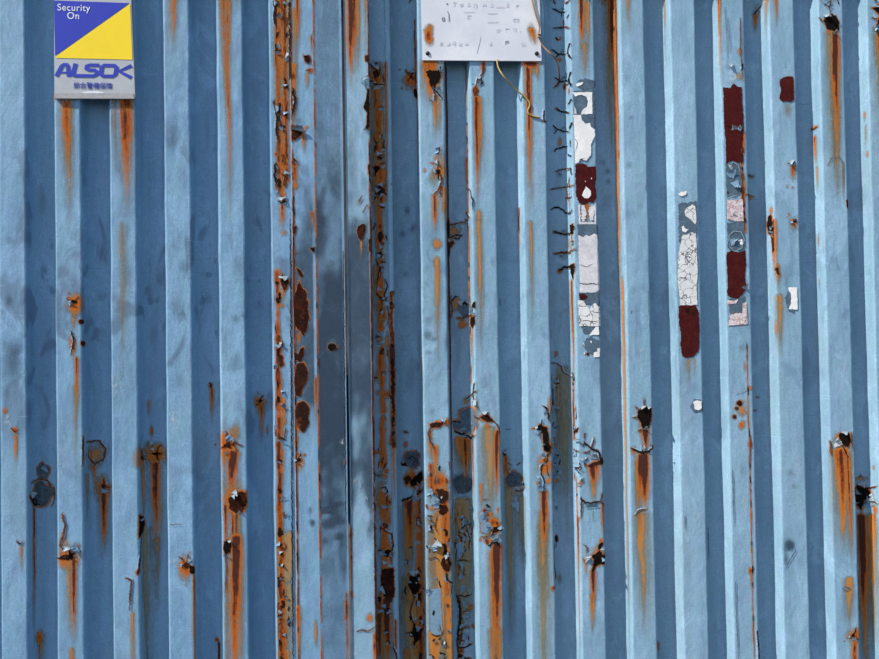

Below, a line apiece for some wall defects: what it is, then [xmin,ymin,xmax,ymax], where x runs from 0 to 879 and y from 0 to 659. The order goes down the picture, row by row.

rust [314,61,472,659]
rust [414,20,449,220]
rust [465,125,474,342]
rust [518,208,533,280]
rust [523,61,538,184]
rust [605,0,652,568]
peeling [725,162,743,199]
peeling [727,222,746,252]
rust [823,13,840,162]
rust [226,489,248,534]
rust [488,484,524,659]
rust [531,279,605,659]